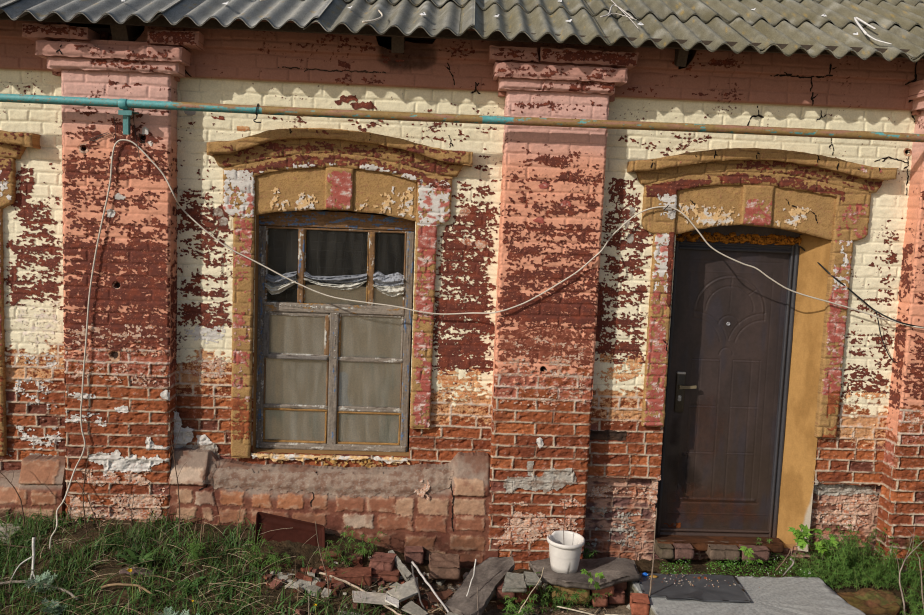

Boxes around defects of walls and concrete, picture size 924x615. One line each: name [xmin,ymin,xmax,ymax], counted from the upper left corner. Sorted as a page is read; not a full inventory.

peeling [23,24,196,72]
peeling [492,48,657,119]
crack [770,64,909,195]
flaking render [810,493,878,531]